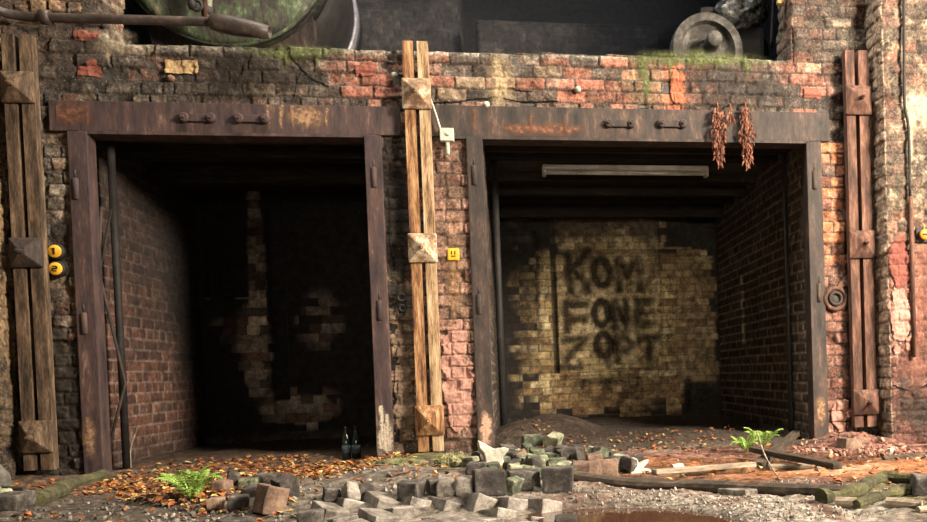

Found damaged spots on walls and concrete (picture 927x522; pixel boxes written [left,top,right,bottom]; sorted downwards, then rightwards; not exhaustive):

rust [266,105,328,127]
rust [506,115,579,134]
peeling [887,237,917,355]